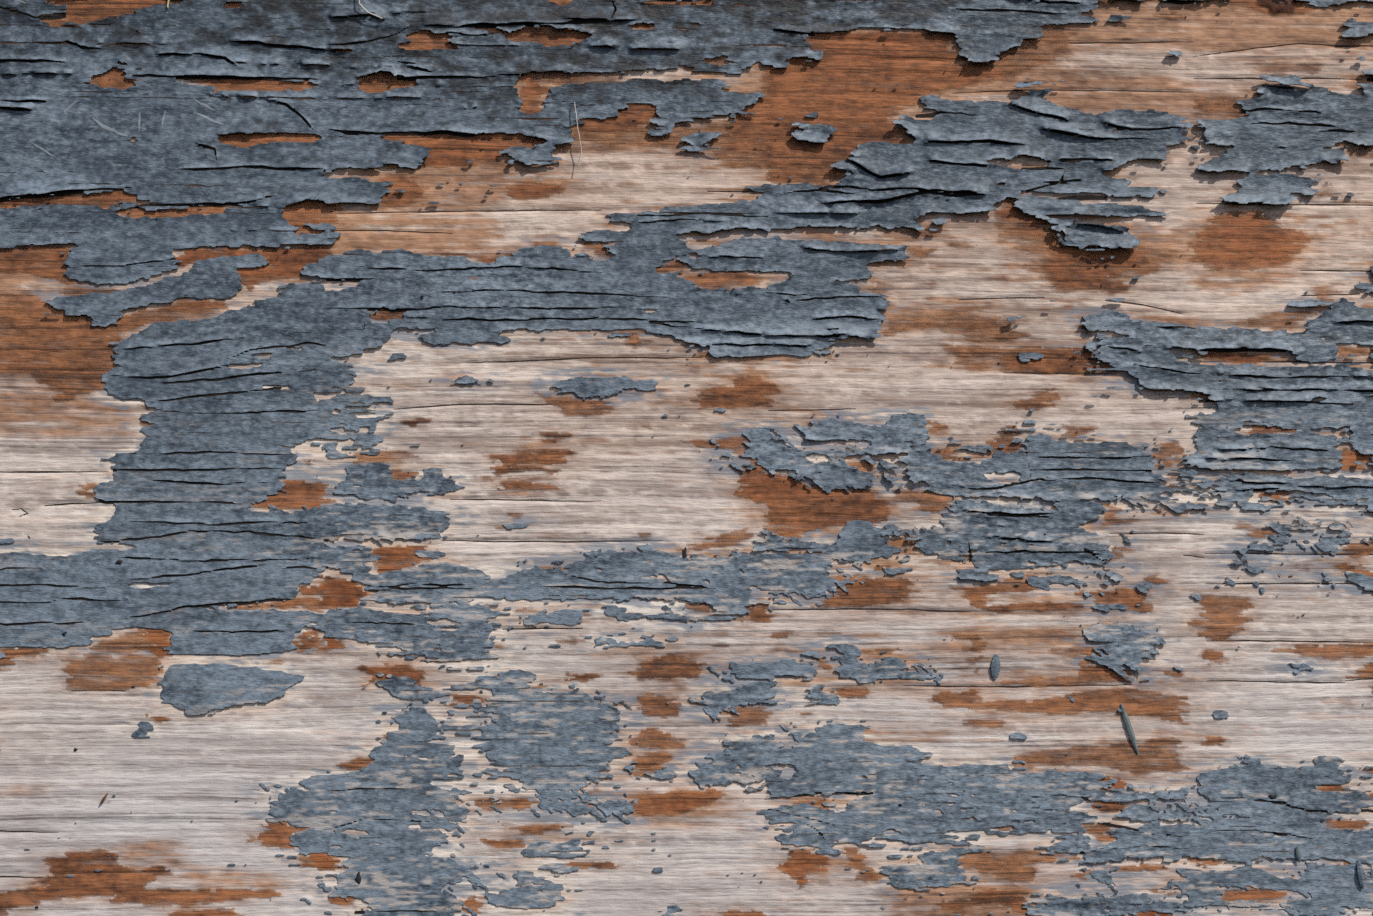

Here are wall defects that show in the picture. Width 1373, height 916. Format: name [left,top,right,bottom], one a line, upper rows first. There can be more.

crack [132,0,700,137]
peeling [0,0,1132,327]
crack [637,0,1373,223]
crack [326,266,878,363]
peeling [0,75,1373,670]
crack [1003,300,1373,405]
crack [0,450,329,633]
crack [952,446,1373,584]
peeling [158,663,305,715]
peeling [1080,621,1166,681]
peeling [260,669,635,916]
peeling [689,719,1373,916]